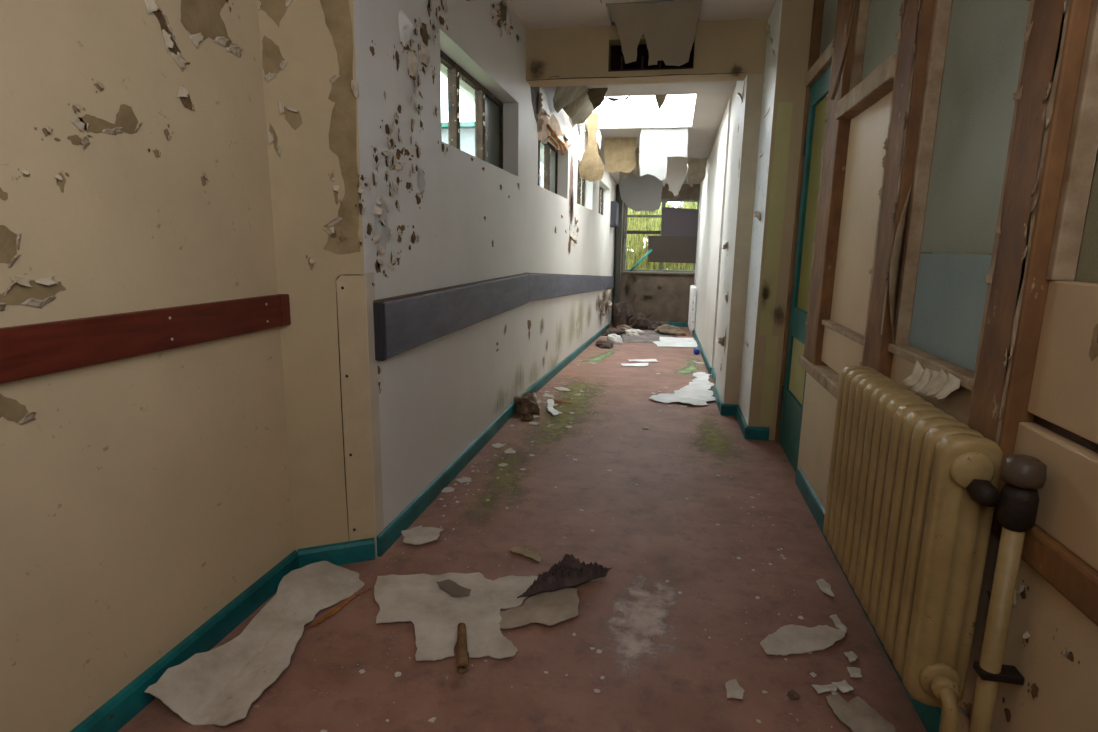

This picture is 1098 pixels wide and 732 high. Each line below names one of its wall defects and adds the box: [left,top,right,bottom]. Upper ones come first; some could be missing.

peeling [144,0,243,71]
peeling [256,0,293,27]
peeling [491,0,521,43]
peeling [177,85,195,111]
peeling [320,0,449,287]
spalling [530,86,572,154]
peeling [54,172,69,193]
peeling [0,225,66,311]